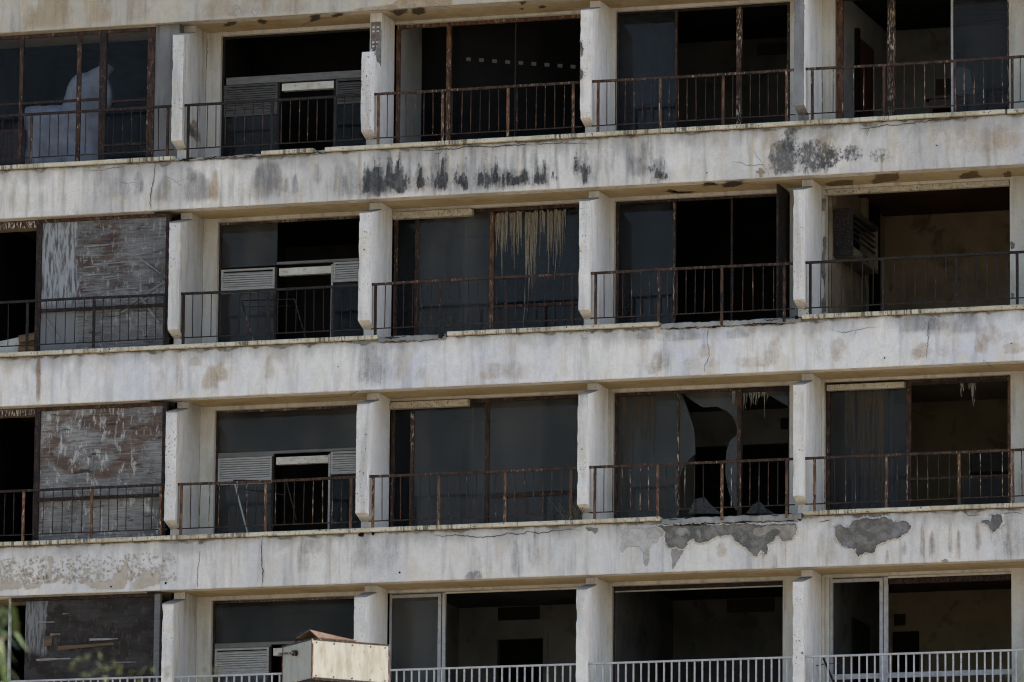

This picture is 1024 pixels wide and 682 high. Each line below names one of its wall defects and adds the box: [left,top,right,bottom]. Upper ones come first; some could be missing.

water stain [362,150,557,197]
water stain [574,157,591,184]
water stain [768,127,862,174]
flaking render [620,513,803,569]
flaking render [832,514,913,559]
flaking render [981,512,1006,535]
peeling [0,552,176,591]